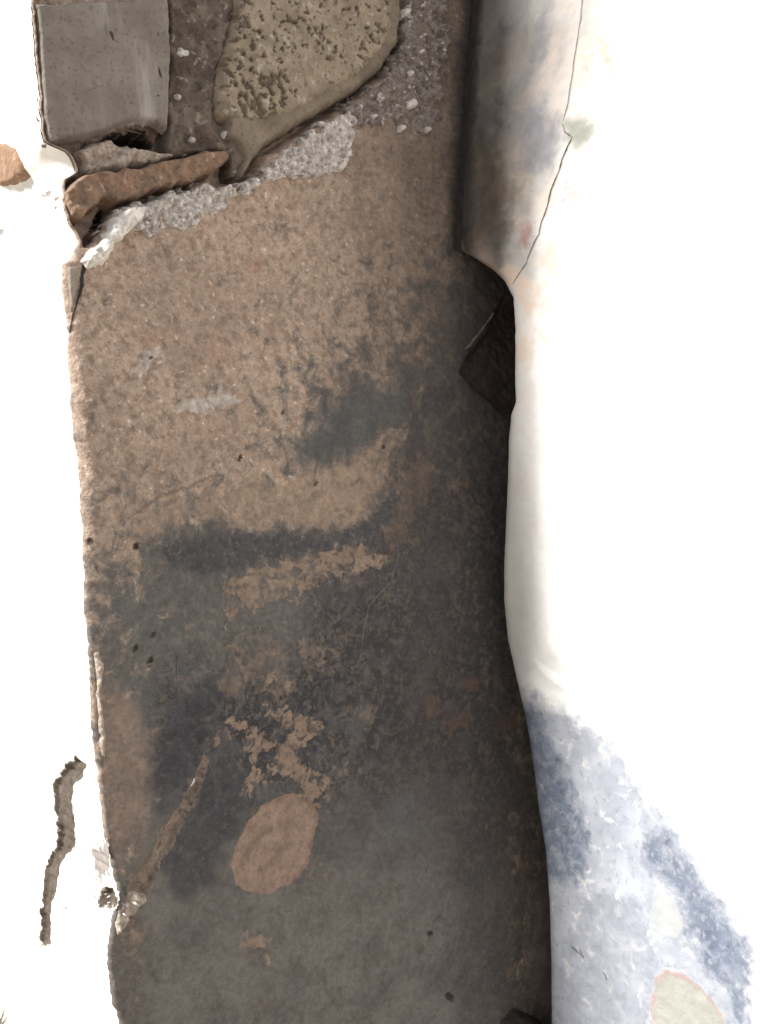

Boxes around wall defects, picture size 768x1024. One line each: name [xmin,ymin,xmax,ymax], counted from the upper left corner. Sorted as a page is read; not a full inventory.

flaking render [105,0,451,238]
crack [513,0,584,284]
peeling [68,267,80,313]
efflorescence [172,384,244,418]
damp [294,380,414,482]
damp [148,483,402,577]
peeling [39,540,390,948]